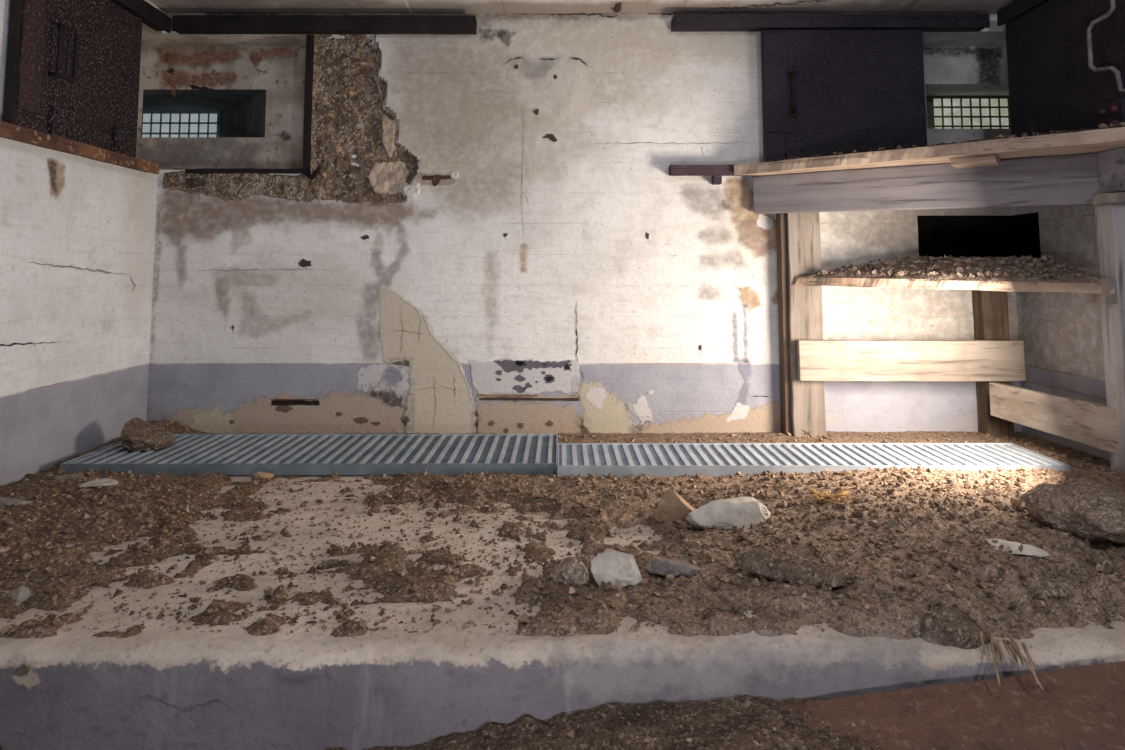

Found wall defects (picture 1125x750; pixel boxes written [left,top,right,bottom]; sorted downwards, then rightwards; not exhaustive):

rust [157,48,295,96]
spalling [161,34,453,206]
crack [27,262,136,290]
flaking render [166,287,782,434]